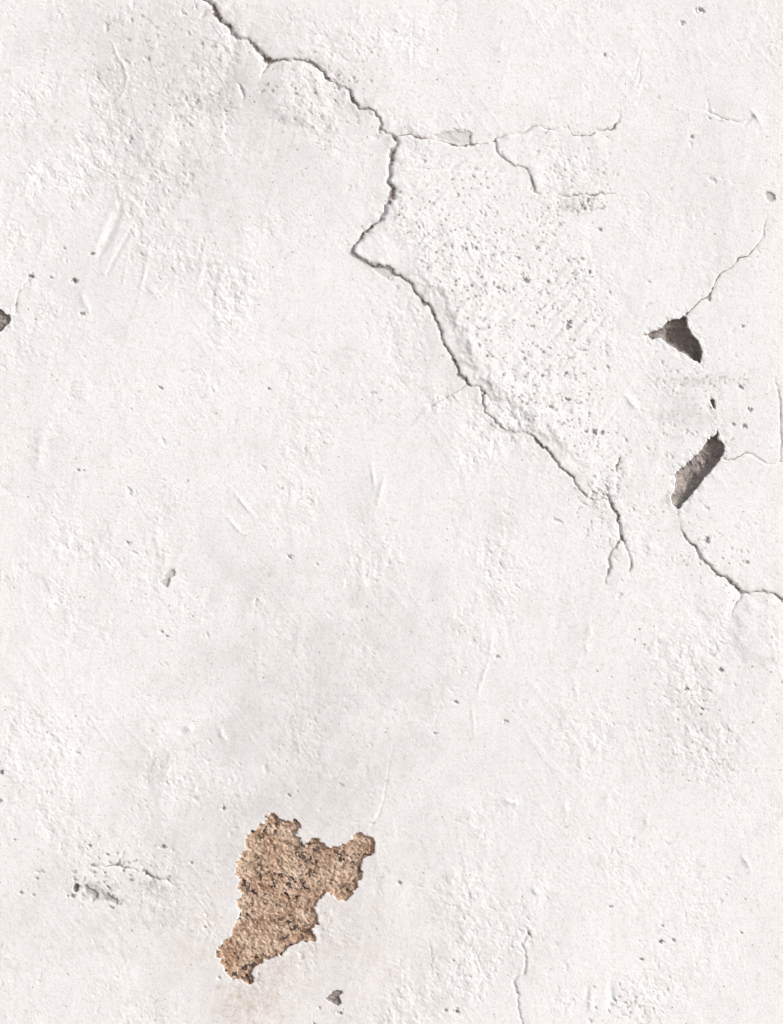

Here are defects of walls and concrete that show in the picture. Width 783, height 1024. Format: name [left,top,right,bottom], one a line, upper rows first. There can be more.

crack [204,0,510,198]
crack [544,123,617,136]
peeling [0,309,11,331]
crack [389,267,492,417]
flaking render [353,123,623,500]
crack [686,222,766,315]
crack [534,437,632,584]
crack [683,534,783,611]
spalling [215,813,375,985]